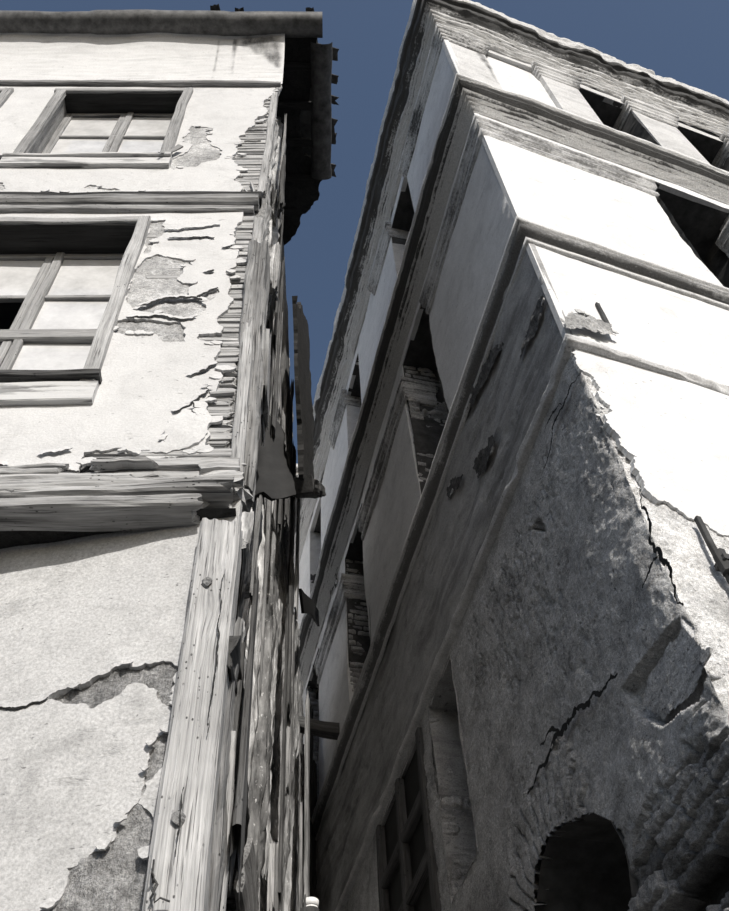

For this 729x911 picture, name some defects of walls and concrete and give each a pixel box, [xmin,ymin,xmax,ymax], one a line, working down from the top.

peeling [170,125,247,170]
peeling [113,222,219,342]
spalling [227,234,247,280]
spalling [209,365,237,379]
spalling [473,435,495,479]
spalling [54,658,178,709]
spalling [642,628,712,719]
crack [527,673,618,794]
spalling [39,721,170,911]